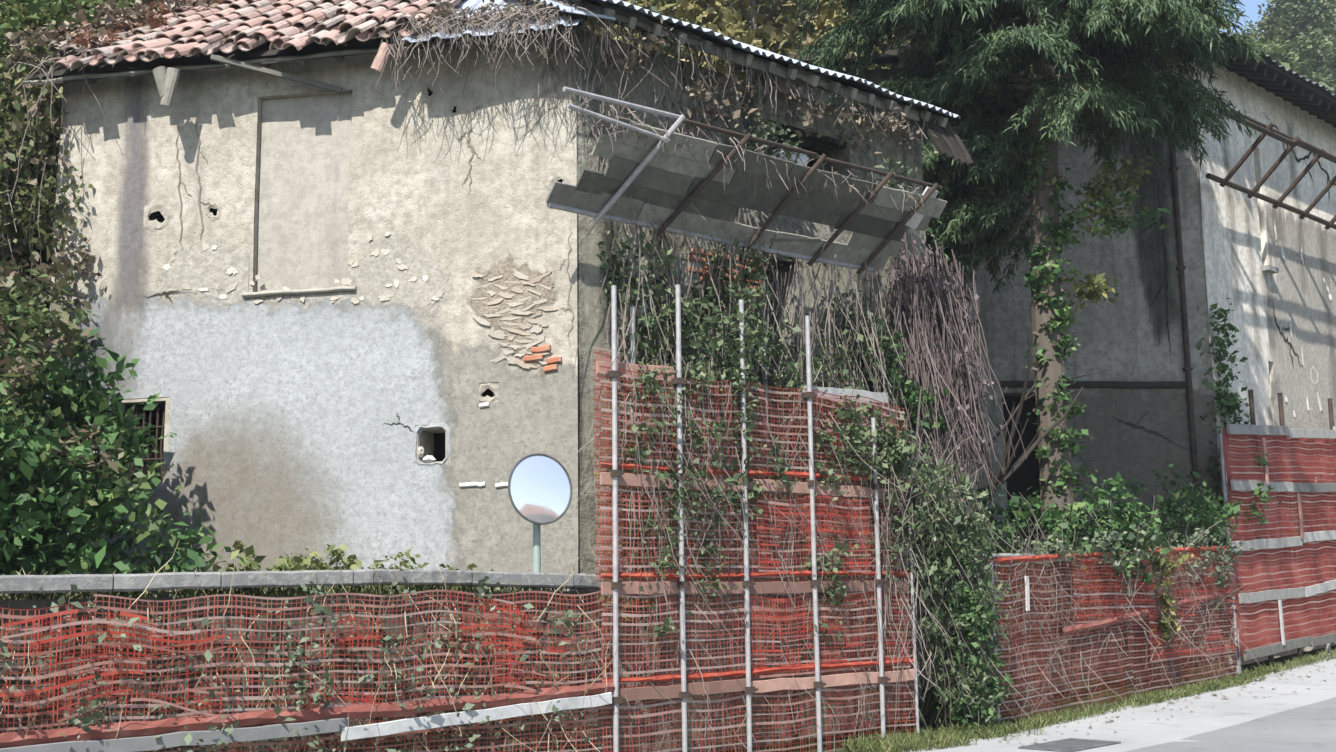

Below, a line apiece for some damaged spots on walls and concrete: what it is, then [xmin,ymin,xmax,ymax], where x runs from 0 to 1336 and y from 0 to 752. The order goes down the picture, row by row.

damp [117,77,145,304]
crack [141,119,227,302]
peeling [157,202,453,320]
crack [458,105,481,192]
spalling [467,256,562,376]
crack [385,413,414,433]
spalling [479,382,499,408]